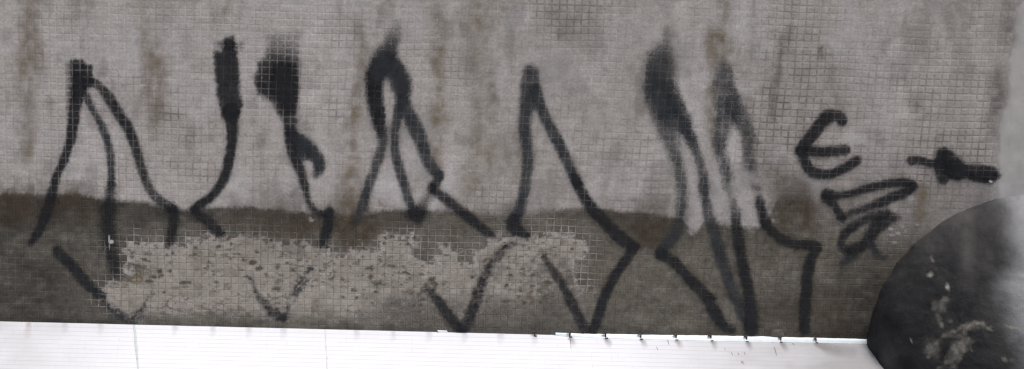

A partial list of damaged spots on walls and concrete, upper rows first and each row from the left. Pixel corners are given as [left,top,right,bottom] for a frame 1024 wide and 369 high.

peeling [91,218,598,333]